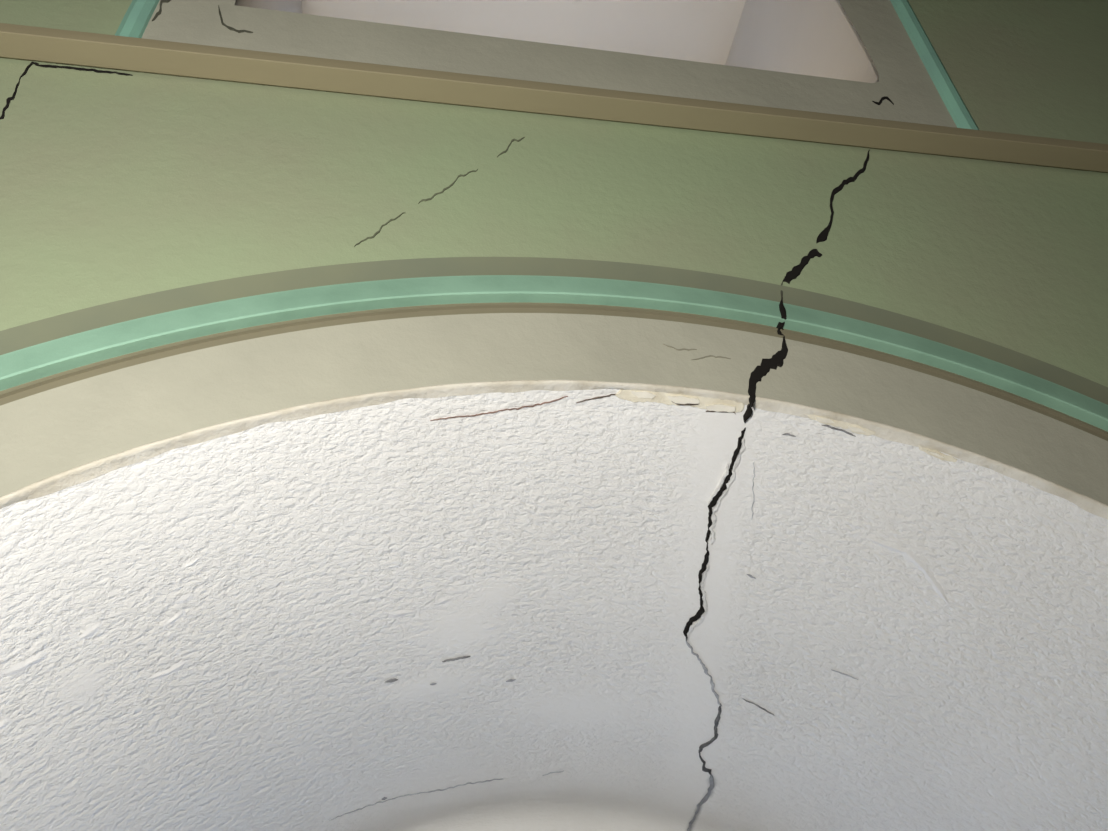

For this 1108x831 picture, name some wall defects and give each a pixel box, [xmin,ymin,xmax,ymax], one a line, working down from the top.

crack [152,0,171,21]
crack [218,5,253,33]
crack [0,62,133,120]
crack [354,137,525,247]
crack [430,394,615,421]
crack [663,150,870,831]